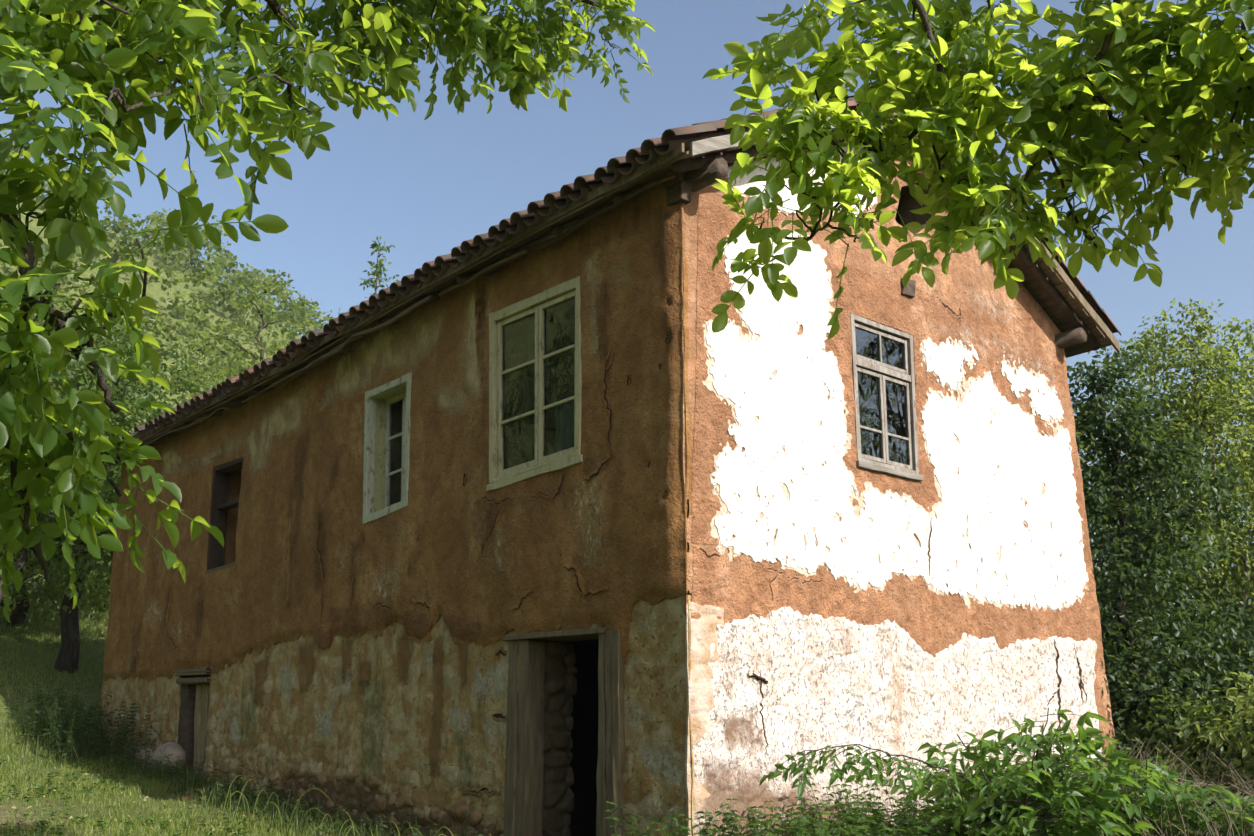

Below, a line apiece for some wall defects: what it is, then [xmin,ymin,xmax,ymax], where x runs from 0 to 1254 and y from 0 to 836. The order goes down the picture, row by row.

crack [520,347,614,505]
flaking render [691,204,1102,670]
crack [748,667,782,797]
crack [1044,639,1088,738]
spalling [268,765,504,836]